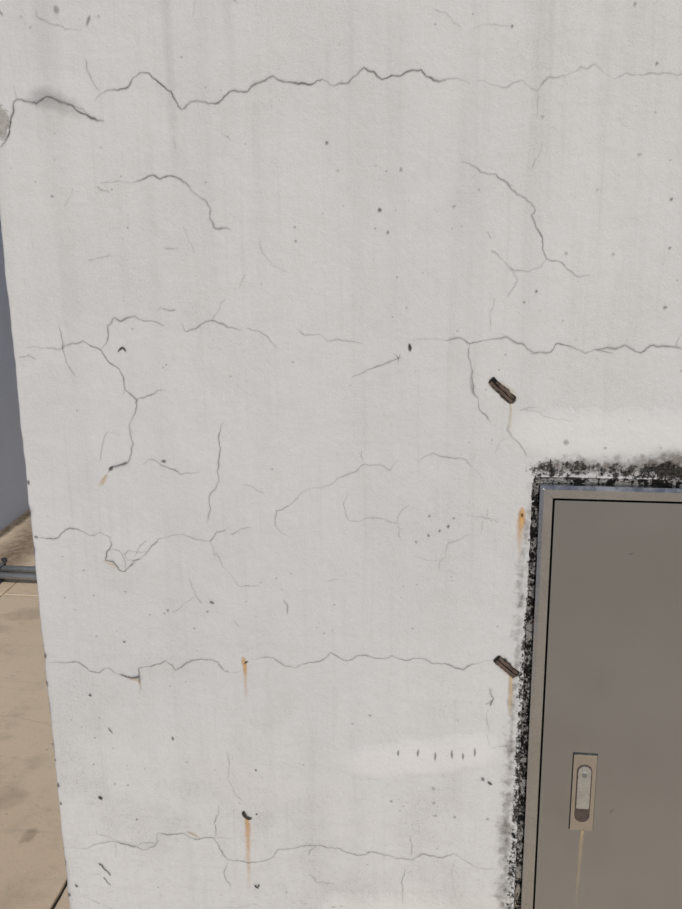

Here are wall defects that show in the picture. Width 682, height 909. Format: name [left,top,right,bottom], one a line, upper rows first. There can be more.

crack [348,67,437,83]
mould [529,454,682,483]
mould [502,597,527,909]